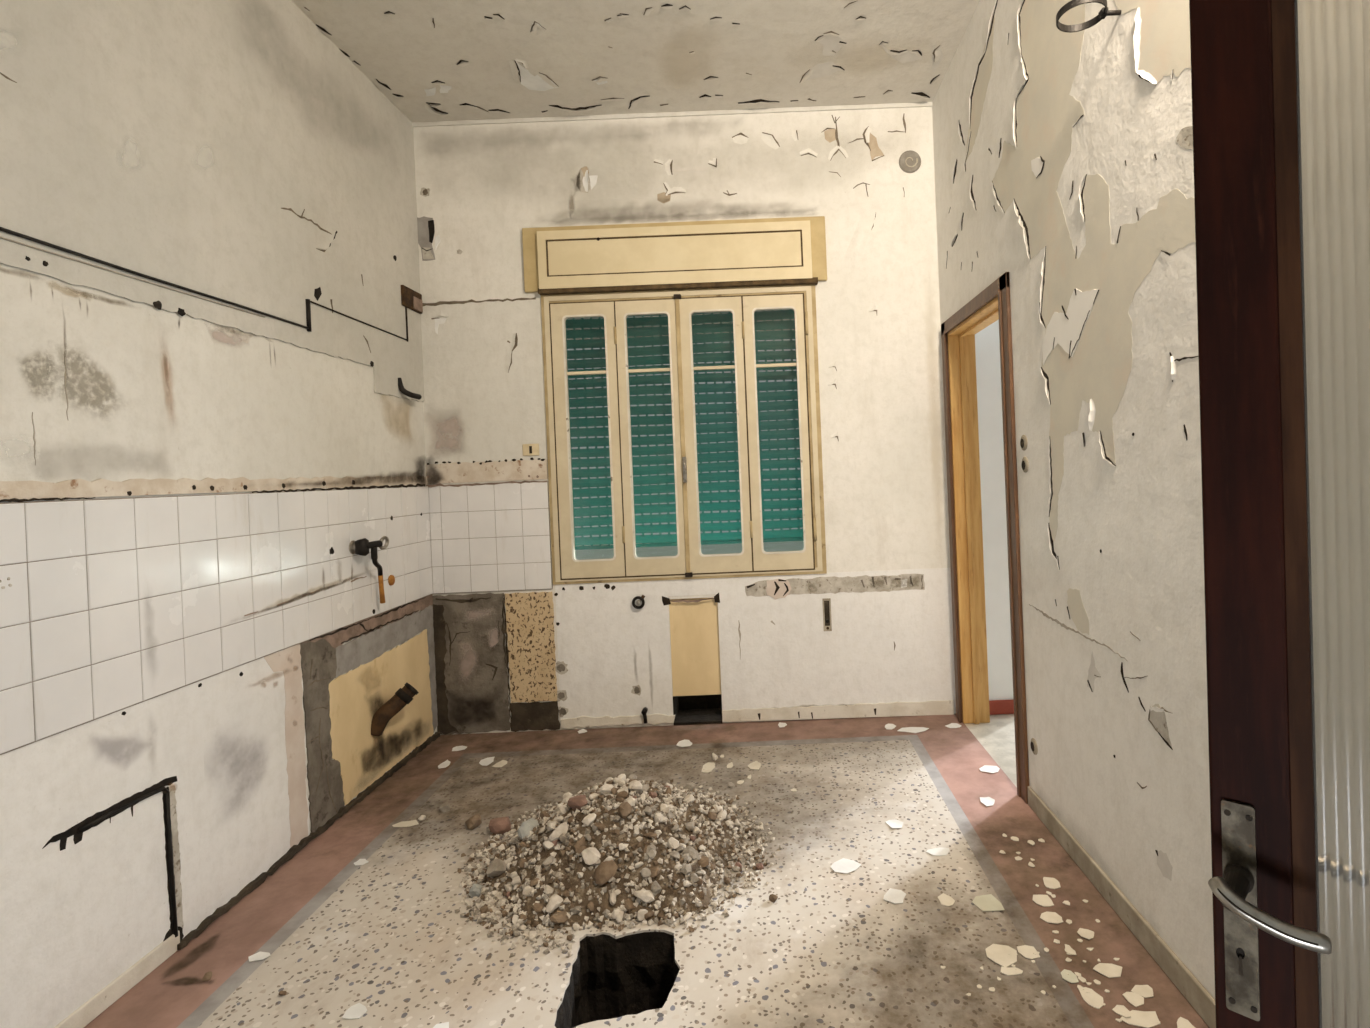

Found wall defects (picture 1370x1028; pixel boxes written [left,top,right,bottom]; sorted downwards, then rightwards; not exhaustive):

peeling [424,80,510,116]
peeling [509,58,668,113]
peeling [699,31,846,105]
peeling [879,41,943,99]
peeling [821,115,884,177]
peeling [576,166,598,193]
peeling [654,158,717,204]
crack [281,208,337,252]
peeling [964,0,1195,541]
peeling [1067,588,1100,692]
peeling [299,592,568,833]
peeling [1148,704,1173,750]